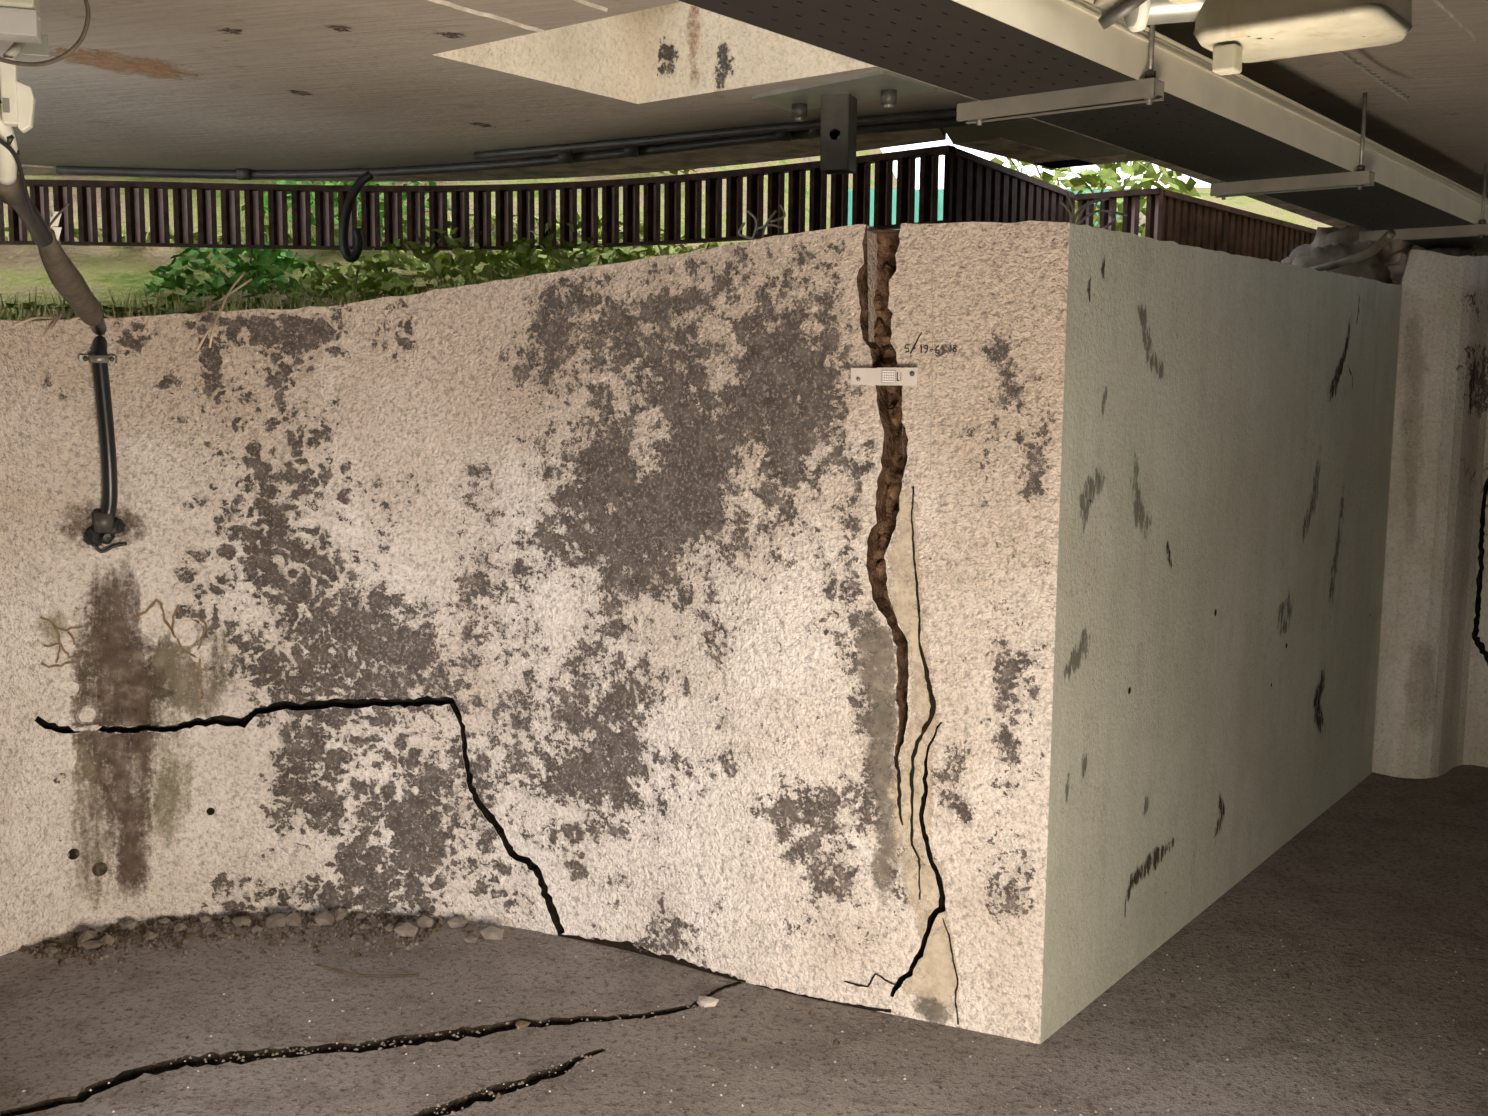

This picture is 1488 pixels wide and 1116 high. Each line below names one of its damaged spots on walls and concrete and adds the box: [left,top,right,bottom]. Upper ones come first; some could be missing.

peeling [112,321,158,357]
damp [70,565,228,898]
crack [0,229,959,1116]
peeling [154,237,1057,1008]
damp [856,611,900,894]
crack [1472,478,1488,665]